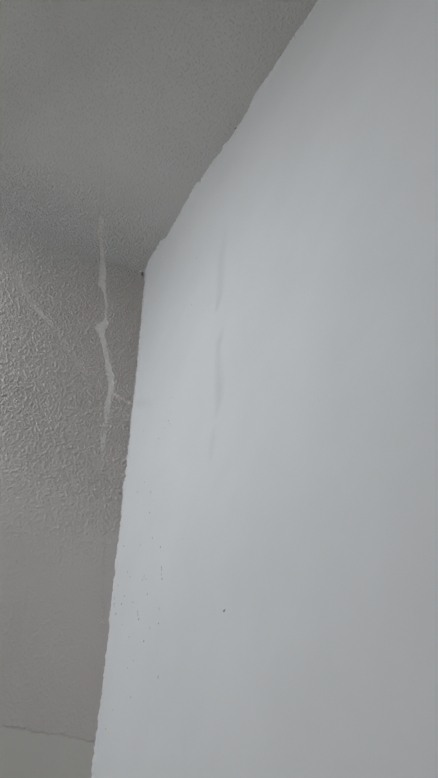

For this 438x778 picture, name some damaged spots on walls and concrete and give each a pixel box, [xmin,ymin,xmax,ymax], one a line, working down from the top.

crack [93,182,132,461]